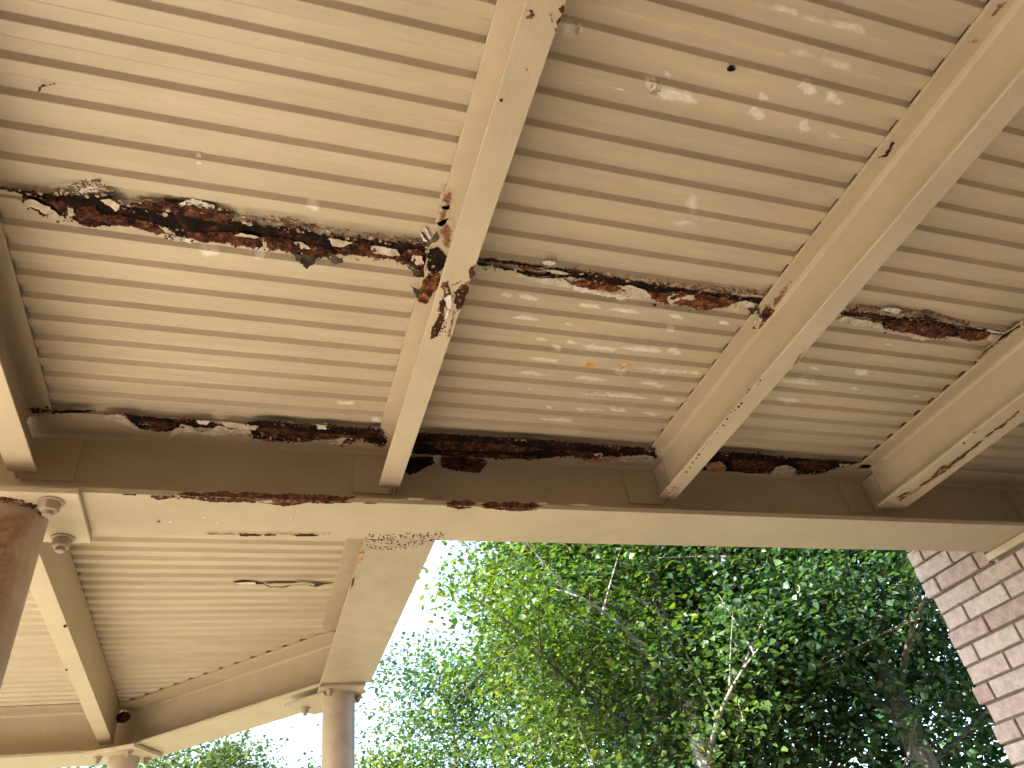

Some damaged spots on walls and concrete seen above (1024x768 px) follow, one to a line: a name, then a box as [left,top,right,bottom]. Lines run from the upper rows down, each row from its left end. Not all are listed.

corrosion [0,187,796,342]
corrosion [843,301,1004,338]
corrosion [124,413,220,432]
corrosion [247,420,390,451]
corrosion [405,433,657,475]
corrosion [151,491,377,507]
corrosion [447,500,548,511]